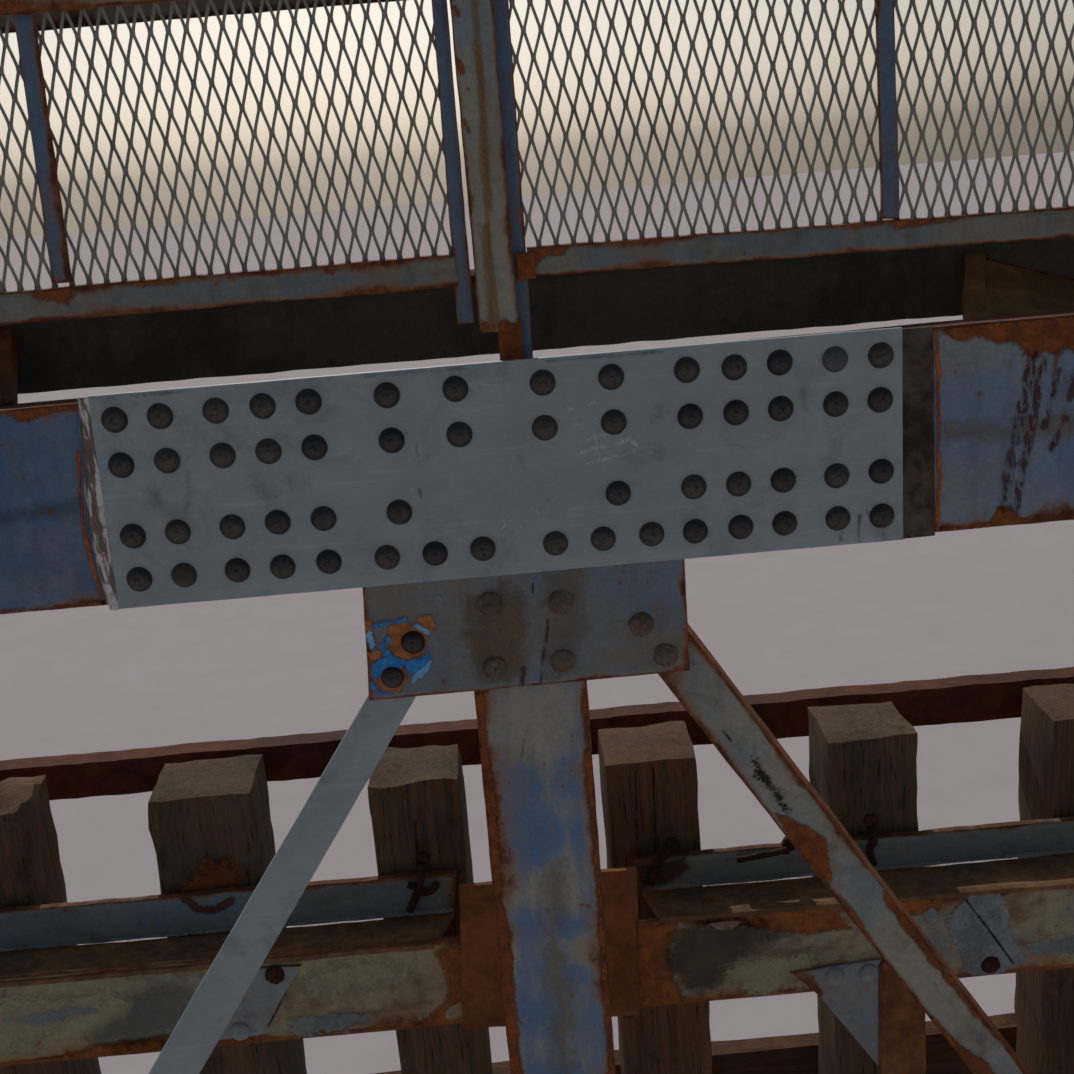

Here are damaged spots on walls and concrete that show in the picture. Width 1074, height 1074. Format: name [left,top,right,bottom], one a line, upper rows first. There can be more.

corrosion [462,0,517,332]
corrosion [934,316,1074,531]
peeling [365,615,436,695]
corrosion [475,694,524,1074]
corrosion [581,689,615,1074]
corrosion [660,900,874,945]
corrosion [750,755,832,882]
corrosion [883,892,981,1018]
corrosion [59,1034,170,1059]
corrosion [926,1012,994,1074]